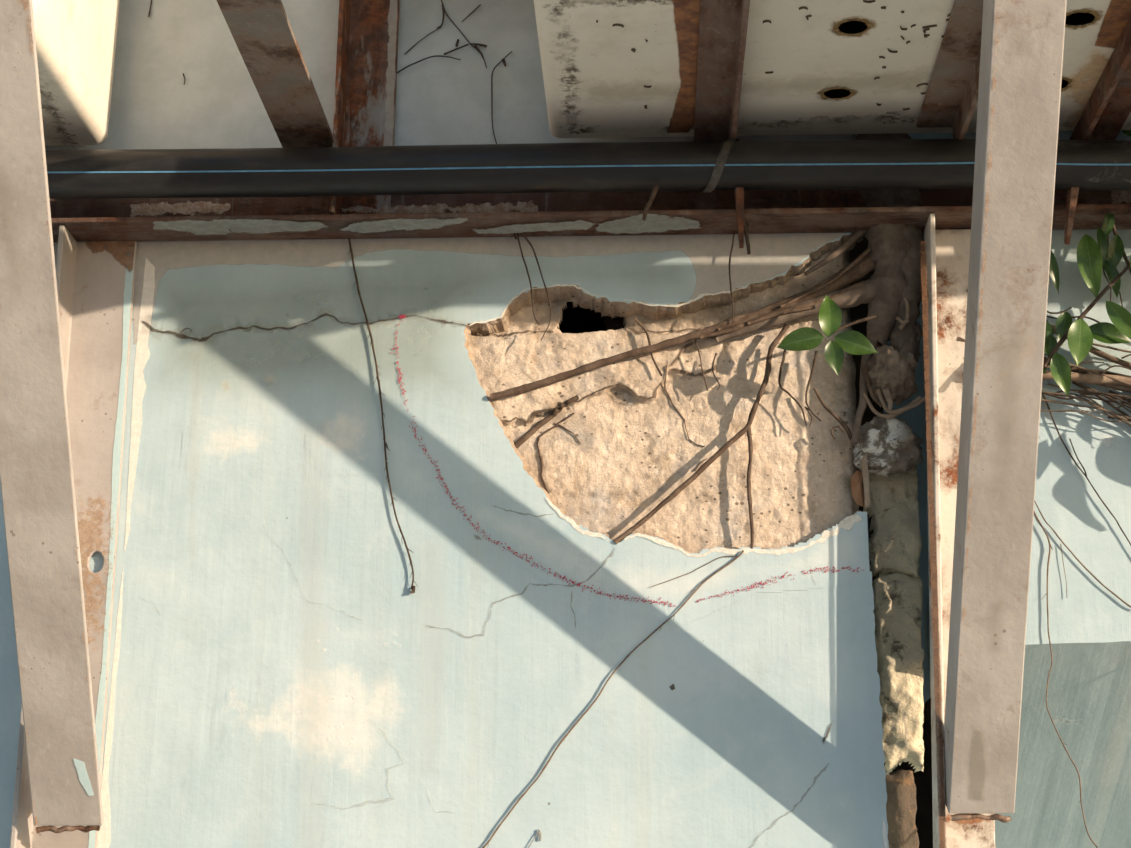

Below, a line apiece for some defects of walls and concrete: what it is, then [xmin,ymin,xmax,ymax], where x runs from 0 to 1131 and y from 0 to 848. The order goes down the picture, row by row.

rust [1095,0,1131,48]
crack [142,313,466,342]
spalling [133,233,870,557]
rust [920,241,990,848]